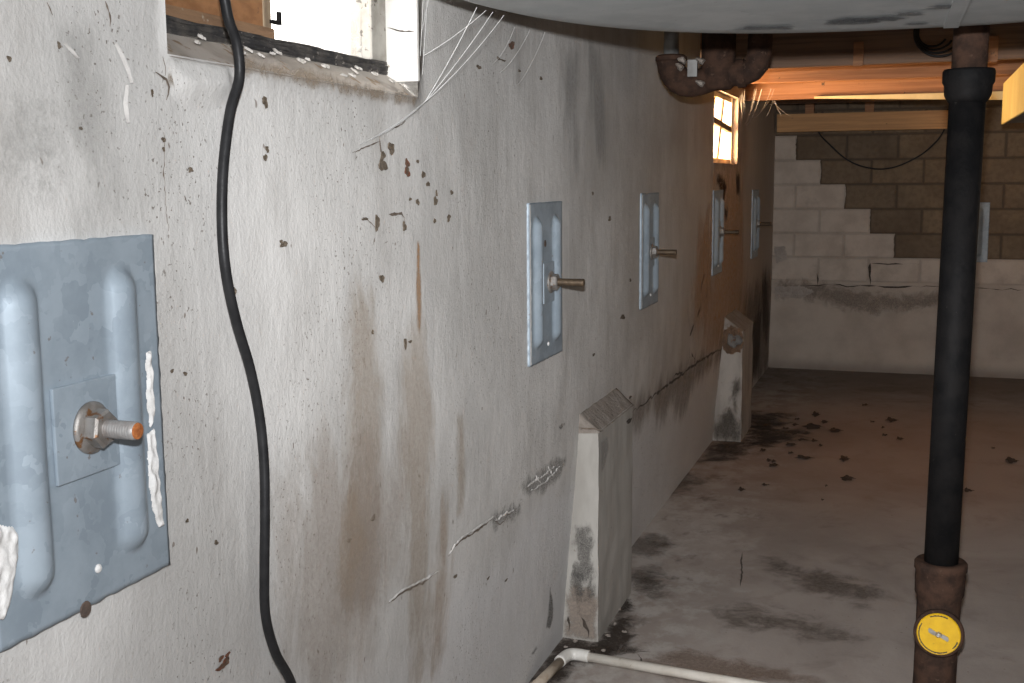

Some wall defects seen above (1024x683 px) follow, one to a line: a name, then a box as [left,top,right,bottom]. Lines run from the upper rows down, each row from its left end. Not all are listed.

crack [802,263,938,288]
crack [632,274,722,413]
water stain [698,381,802,462]
crack [389,512,512,603]
water stain [573,527,594,597]